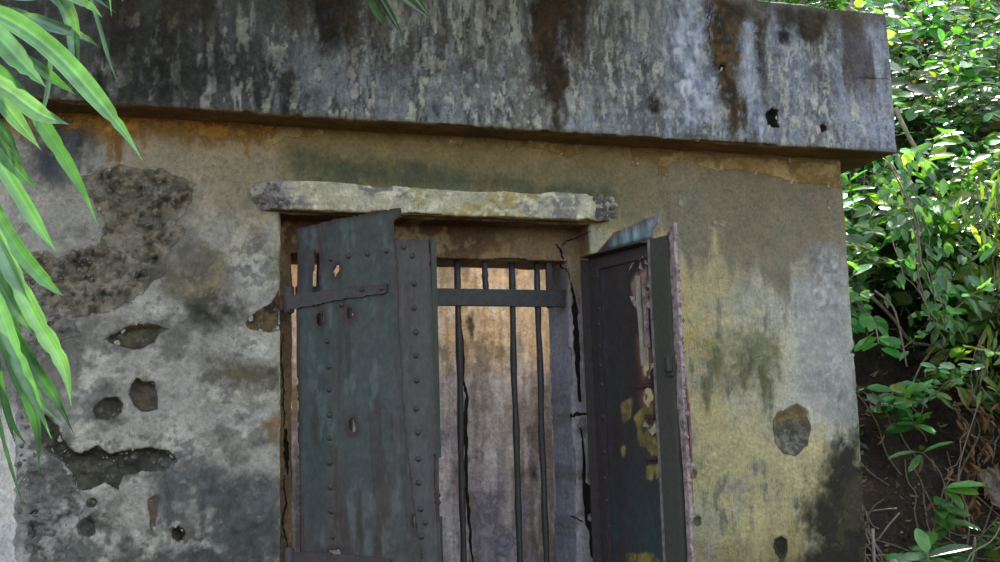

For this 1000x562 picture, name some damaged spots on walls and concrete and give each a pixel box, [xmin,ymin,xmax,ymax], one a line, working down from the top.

water stain [313,0,344,54]
water stain [528,0,572,125]
water stain [649,0,718,138]
rust [706,0,747,128]
rust [52,112,275,161]
spalling [19,164,194,342]
spalling [13,388,178,562]
spalling [93,378,158,420]
spalling [106,322,168,349]
crack [555,231,593,559]
spalling [773,404,811,456]
water stain [803,248,866,562]